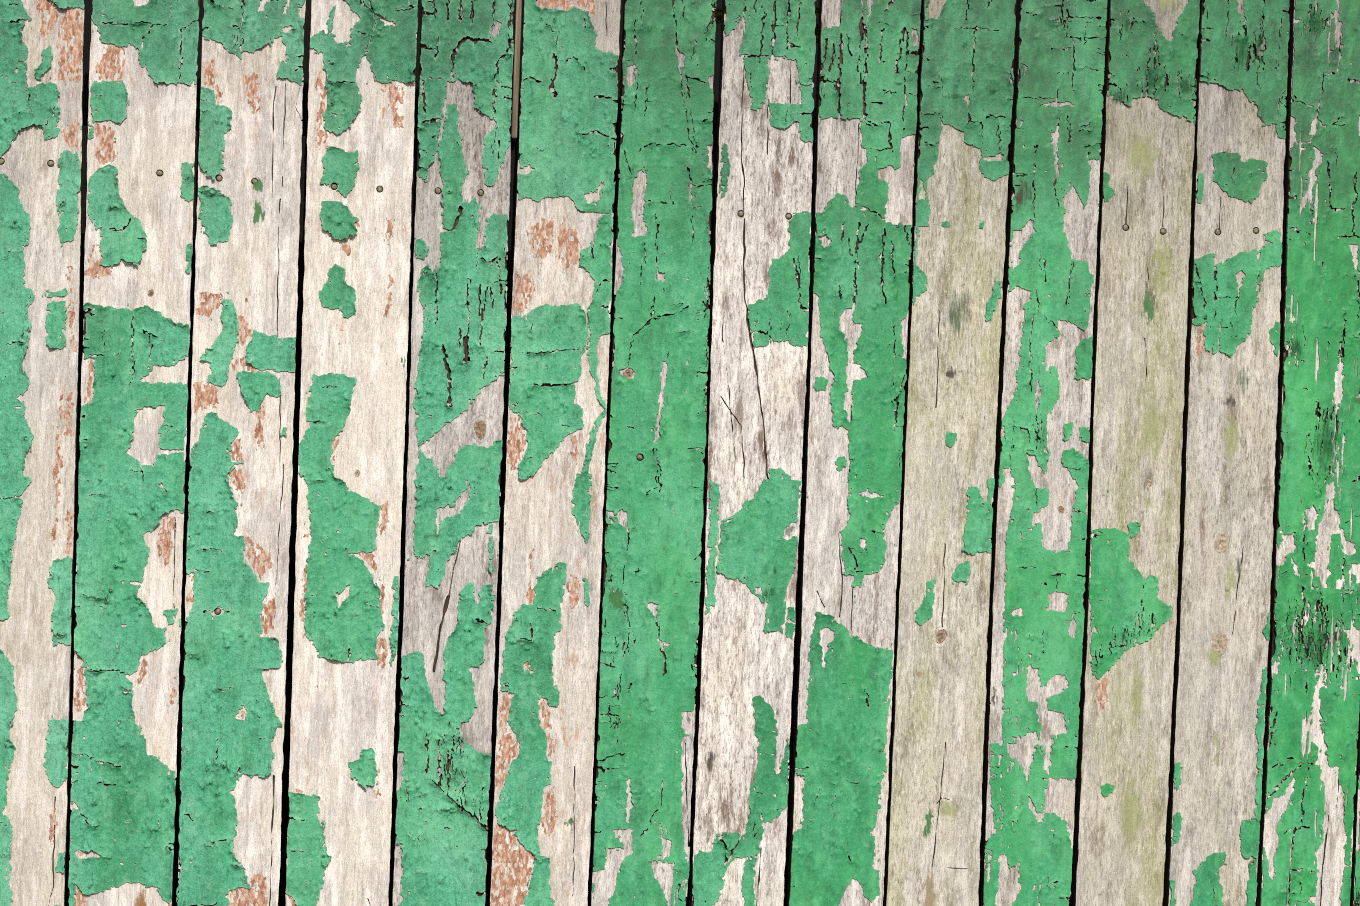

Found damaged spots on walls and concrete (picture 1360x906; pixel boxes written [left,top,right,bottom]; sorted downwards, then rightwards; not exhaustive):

crack [358,0,648,123]
crack [957,0,1103,218]
peeling [0,0,306,906]
crack [448,207,462,231]
crack [443,259,502,406]
crack [522,349,575,413]
crack [583,0,934,479]
peeling [286,0,1360,906]
crack [933,301,941,407]
crack [1015,415,1041,451]
crack [1043,263,1073,326]
crack [1327,166,1360,238]